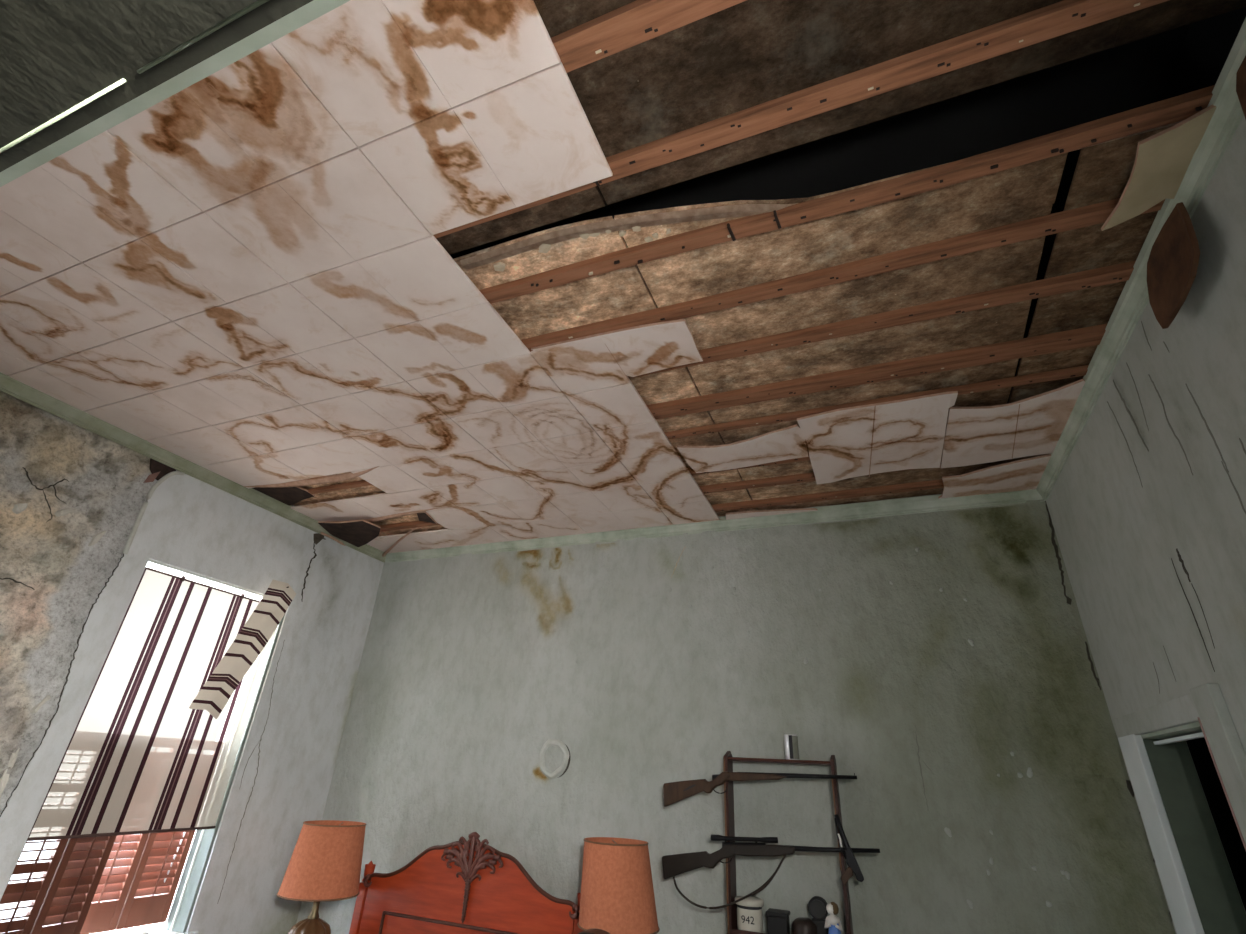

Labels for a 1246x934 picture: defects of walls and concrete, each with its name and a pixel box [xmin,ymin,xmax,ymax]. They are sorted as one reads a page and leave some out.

leakage [426,0,511,37]
leakage [206,61,272,126]
leakage [436,149,508,214]
peeling [579,226,671,242]
leakage [409,379,495,469]
crack [1107,321,1246,514]
crack [22,467,69,522]
leakage [527,446,705,522]
crack [301,533,326,600]
crack [1045,501,1072,605]
crack [1171,549,1215,672]
crack [1126,780,1140,814]